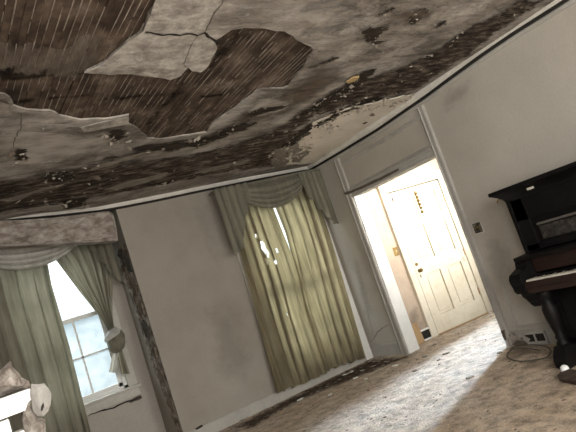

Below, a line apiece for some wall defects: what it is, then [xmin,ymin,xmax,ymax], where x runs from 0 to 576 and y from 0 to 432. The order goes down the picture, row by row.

crack [145,1,225,68]
peeling [269,8,333,28]
spalling [0,0,312,167]
water stain [0,0,544,214]
peeling [300,66,380,115]
peeling [268,92,414,168]